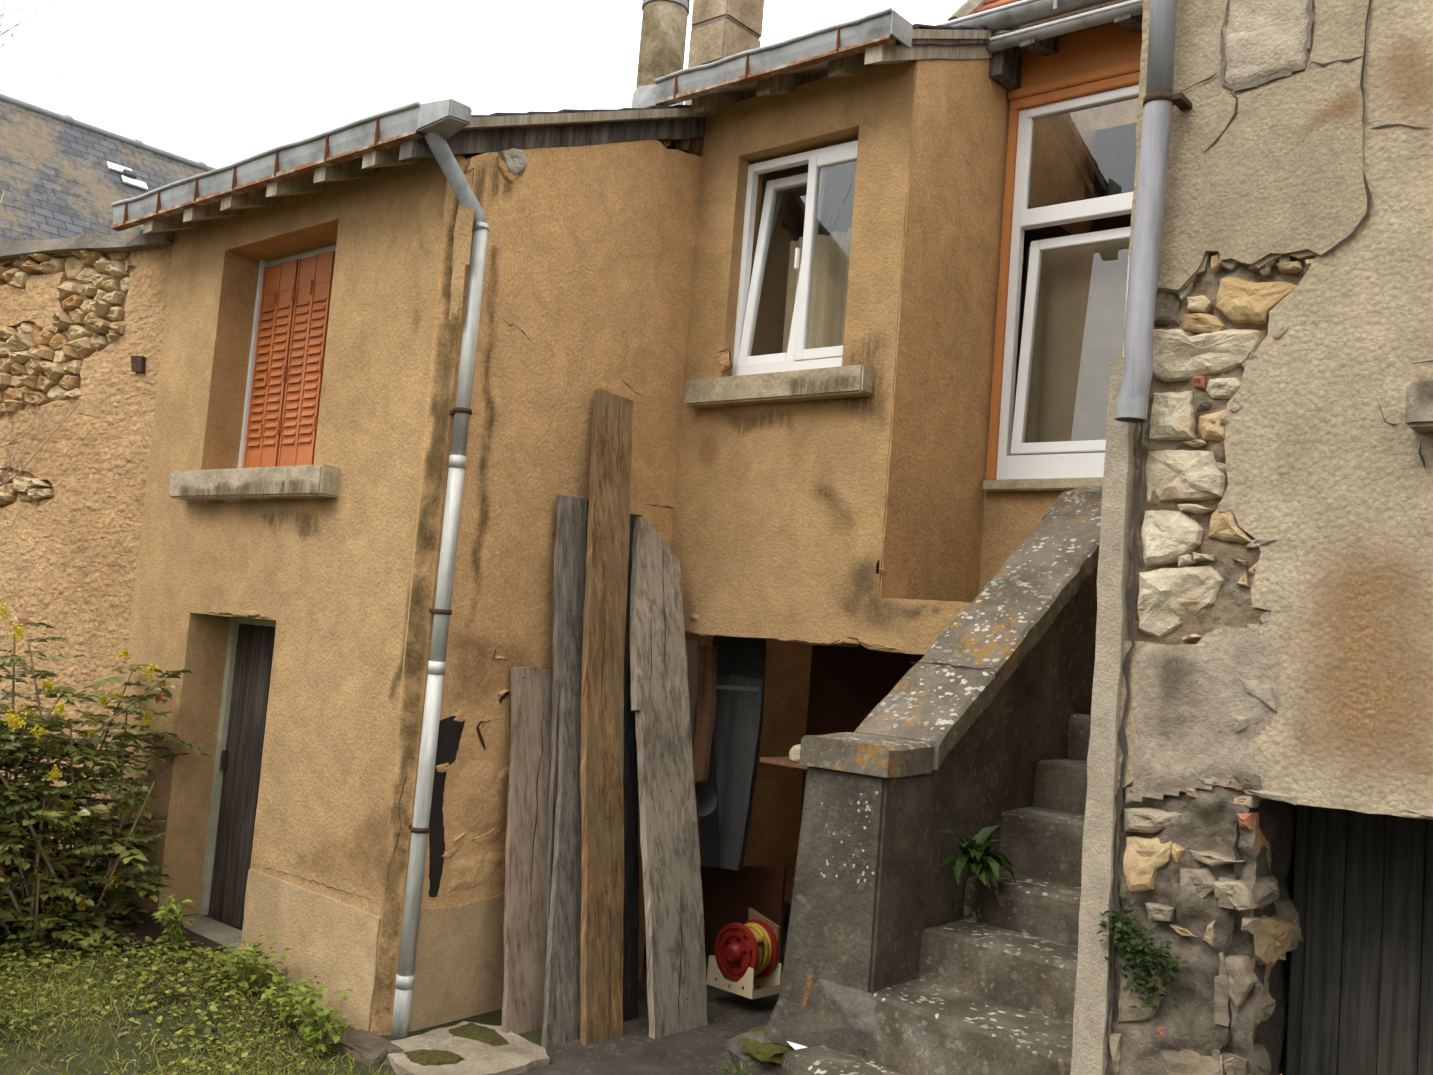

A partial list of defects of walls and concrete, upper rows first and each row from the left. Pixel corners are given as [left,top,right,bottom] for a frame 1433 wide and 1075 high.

crack [1181,72,1238,152]
crack [1304,0,1424,129]
crack [1323,172,1372,255]
flaking render [0,249,135,419]
flaking render [0,468,54,508]
flaking render [1108,57,1370,1075]
leakage [1317,564,1433,763]
flaking render [1392,809,1433,818]